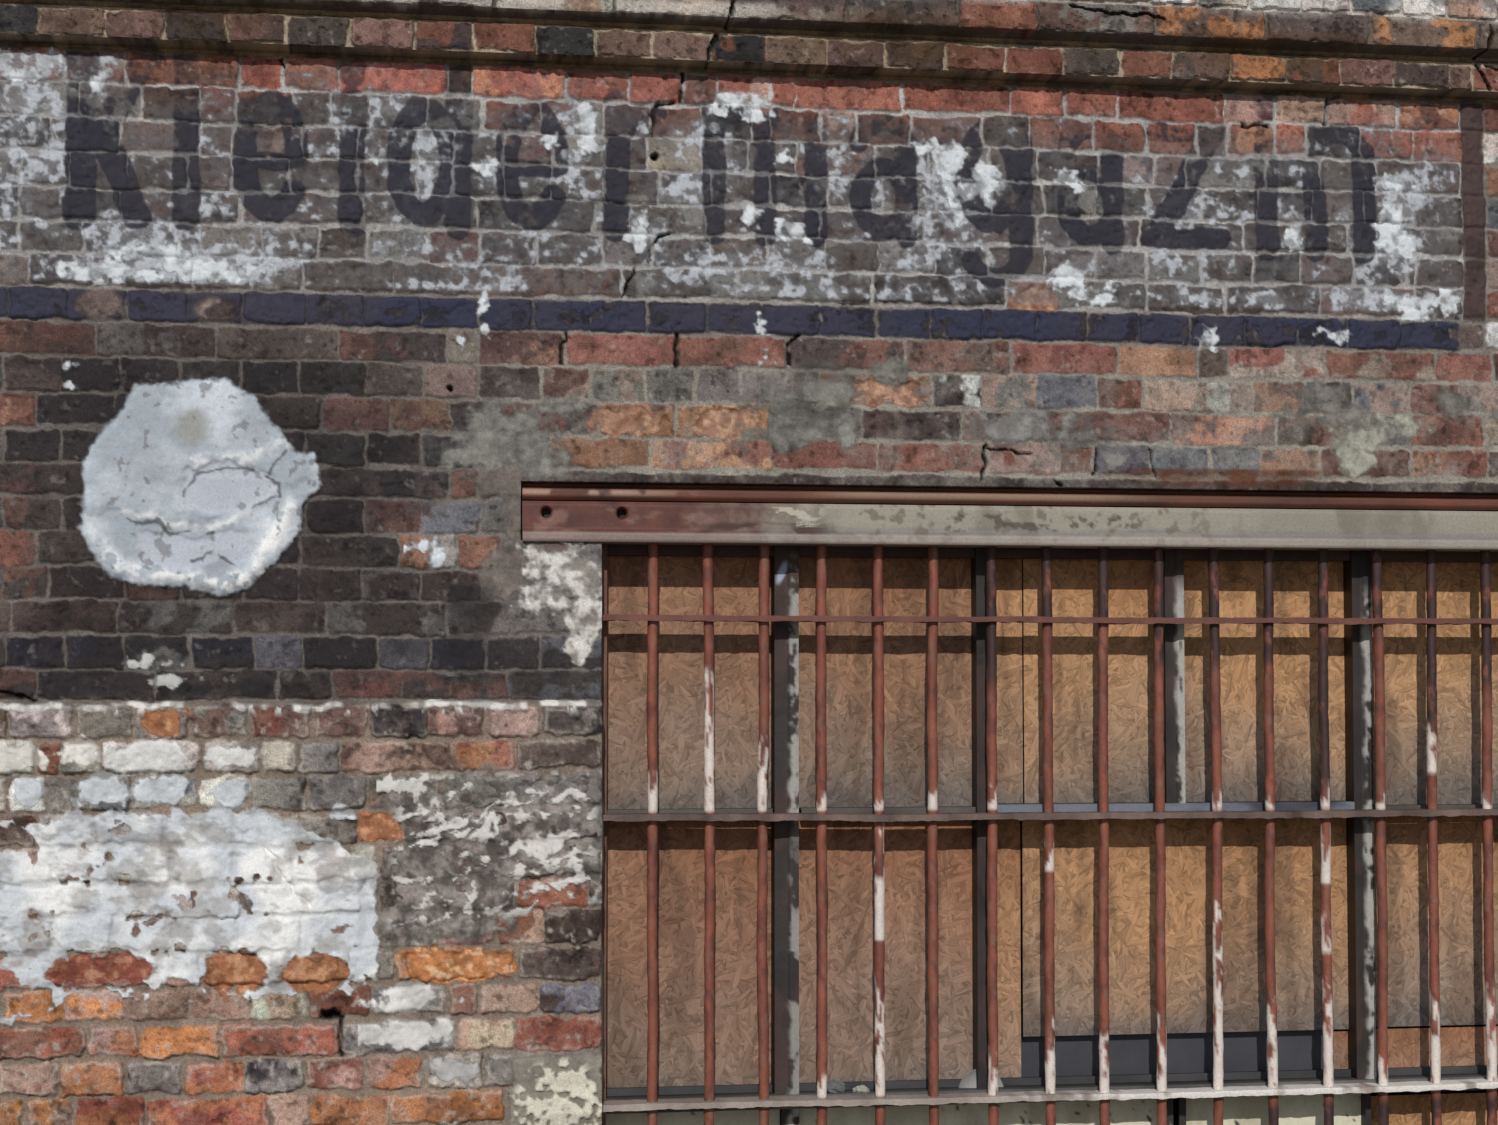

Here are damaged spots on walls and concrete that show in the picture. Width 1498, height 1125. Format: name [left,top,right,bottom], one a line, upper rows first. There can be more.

crack [1070,6,1163,20]
crack [649,0,735,137]
peeling [541,135,557,150]
peeling [776,149,794,163]
crack [622,233,669,297]
spalling [1007,283,1059,313]
crack [980,445,1097,487]
crack [129,518,233,564]
rust [795,525,819,533]
peeling [517,542,602,666]
peeling [0,745,400,1011]
peeling [512,1058,602,1125]